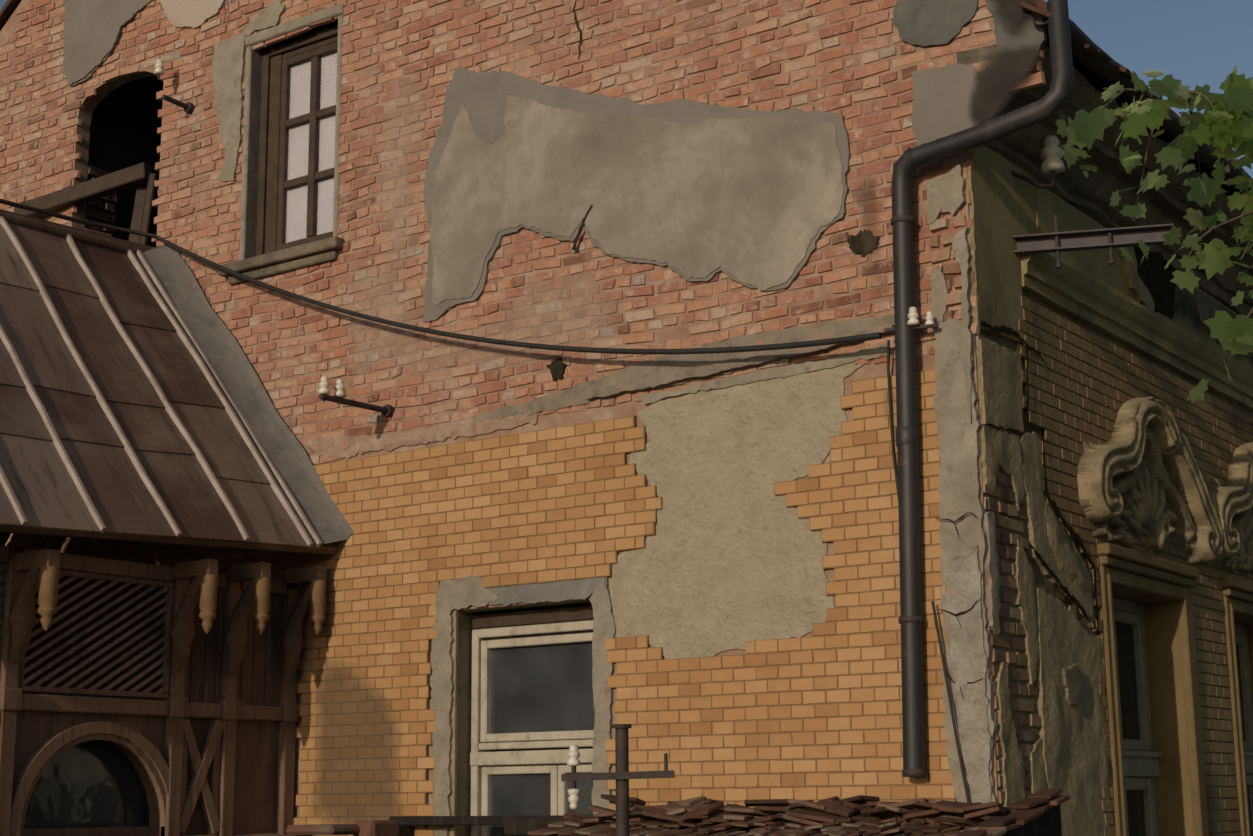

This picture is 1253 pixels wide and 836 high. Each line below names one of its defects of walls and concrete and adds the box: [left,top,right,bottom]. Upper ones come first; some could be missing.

peeling [63,0,226,87]
crack [572,0,582,59]
peeling [893,0,1047,62]
peeling [911,63,978,146]
peeling [422,66,851,322]
spalling [563,163,1048,828]
crack [936,512,977,535]
crack [938,598,981,632]
crack [947,674,983,699]